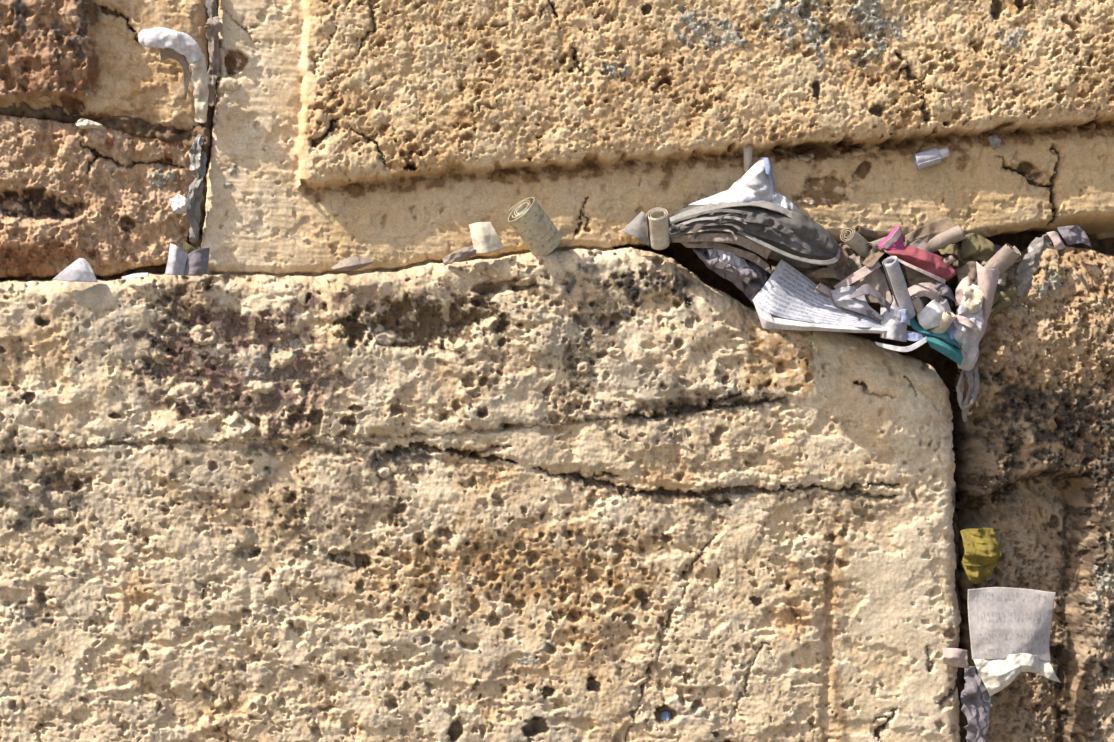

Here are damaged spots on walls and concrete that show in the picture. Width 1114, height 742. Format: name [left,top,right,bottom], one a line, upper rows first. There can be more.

crack [311,119,339,147]
crack [362,133,385,164]
crack [1002,167,1055,224]
crack [631,394,768,417]
crack [395,441,896,505]